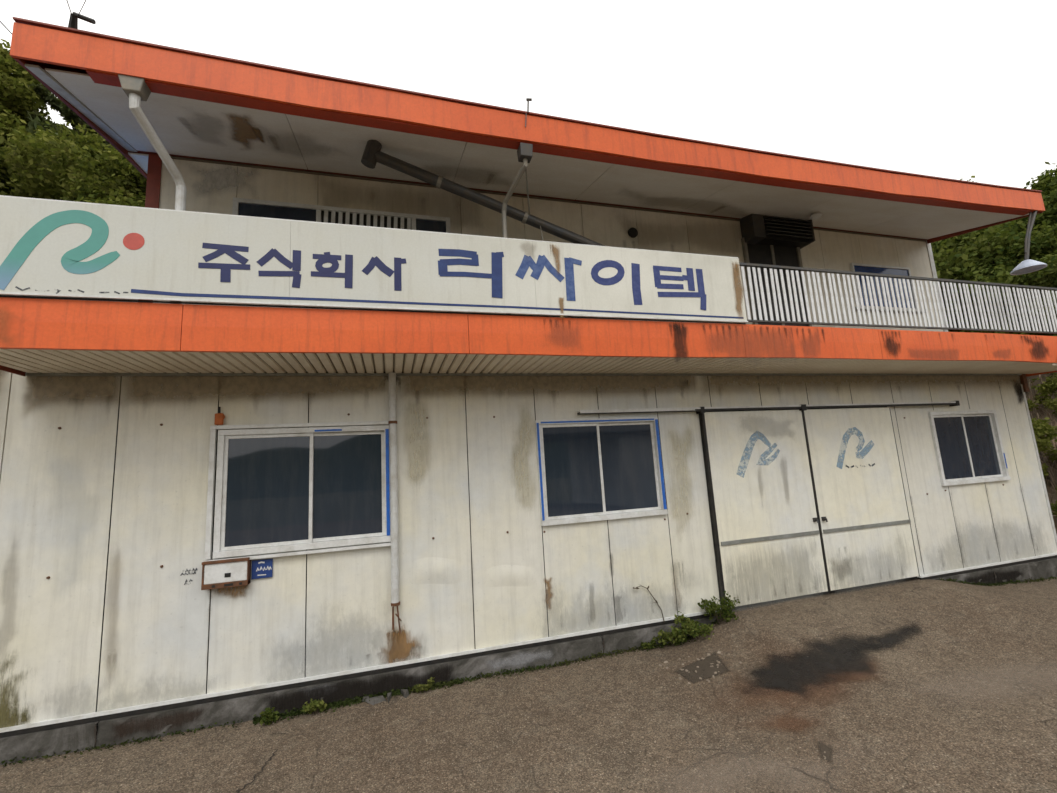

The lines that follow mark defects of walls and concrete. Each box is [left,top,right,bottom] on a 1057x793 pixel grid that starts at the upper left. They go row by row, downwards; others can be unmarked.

corrosion [384,630,415,663]
crack [236,749,278,793]